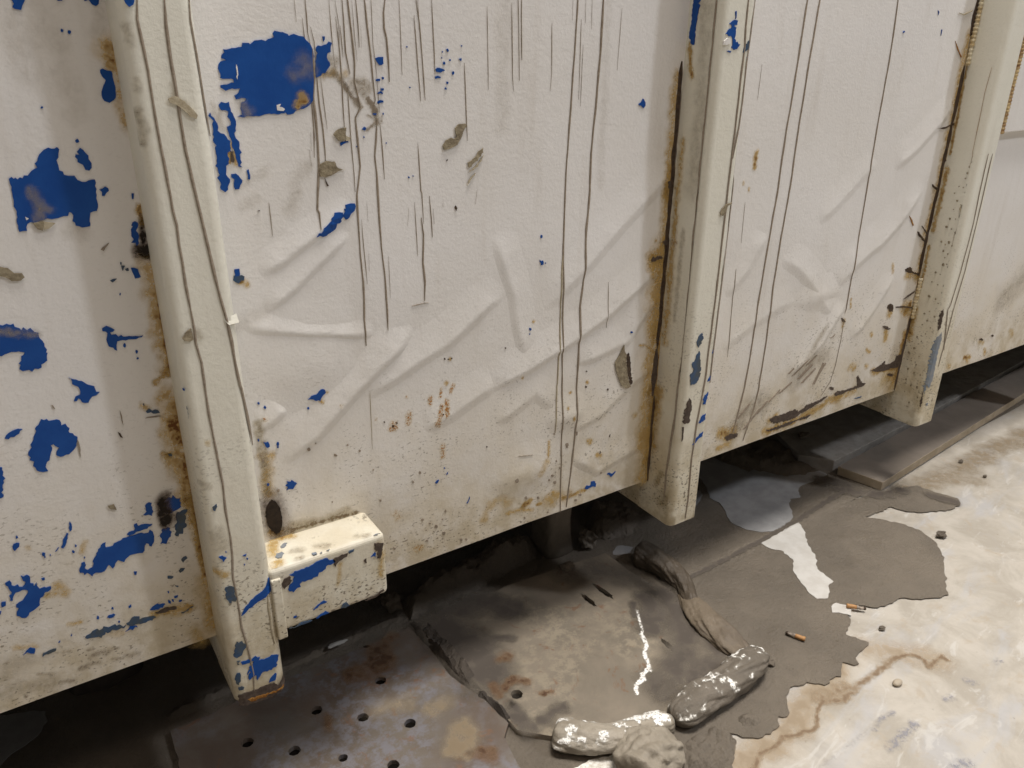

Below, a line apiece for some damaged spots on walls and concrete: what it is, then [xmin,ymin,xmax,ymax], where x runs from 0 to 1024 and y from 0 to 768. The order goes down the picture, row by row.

corrosion [101,39,121,99]
peeling [208,31,332,192]
peeling [9,139,109,232]
peeling [0,324,48,371]
corrosion [635,140,684,480]
peeling [28,405,78,472]
corrosion [143,264,215,641]
corrosion [428,381,455,427]
corrosion [762,395,841,435]
peeling [42,492,188,576]
peeling [224,549,354,616]
water stain [732,645,951,768]